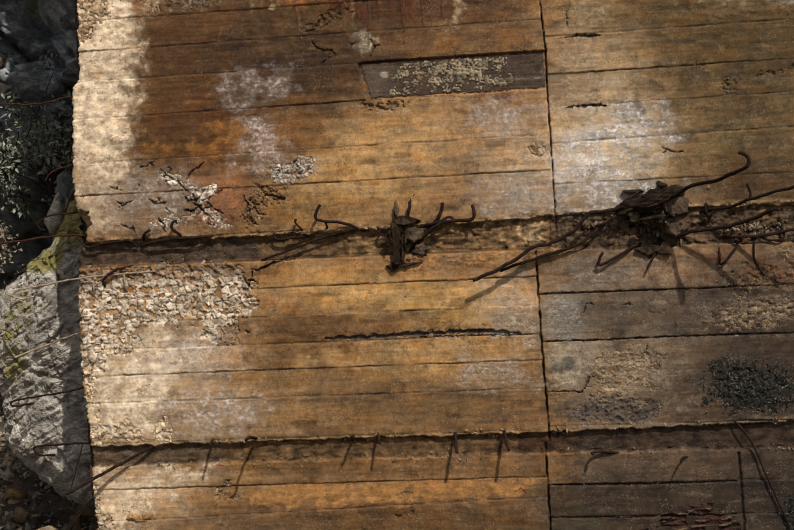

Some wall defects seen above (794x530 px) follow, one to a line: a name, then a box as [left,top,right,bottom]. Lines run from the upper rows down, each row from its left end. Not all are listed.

water stain [251,1,371,56]
water stain [72,0,207,230]
water stain [217,70,288,108]
water stain [238,118,283,177]
spalling [77,155,316,248]
spalling [409,202,476,256]
spalling [472,205,627,282]
spalling [597,242,642,266]
spalling [654,151,751,209]
spalling [670,183,794,337]
spalling [10,257,259,530]